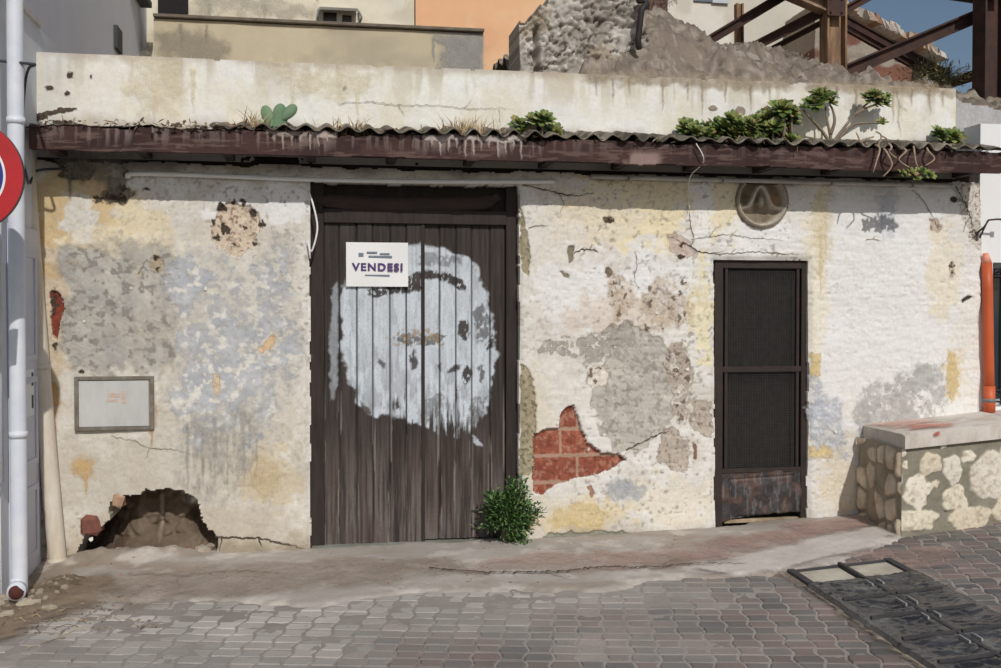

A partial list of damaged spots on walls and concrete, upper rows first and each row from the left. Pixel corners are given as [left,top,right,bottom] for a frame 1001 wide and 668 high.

water stain [587,70,789,100]
crack [956,186,975,229]
flaking render [667,233,696,259]
flaking render [50,199,306,453]
flaking render [519,267,714,497]
flaking render [807,375,847,460]
flaking render [854,364,949,432]
hole [77,488,218,552]
crack [128,535,305,584]
crack [429,558,735,577]